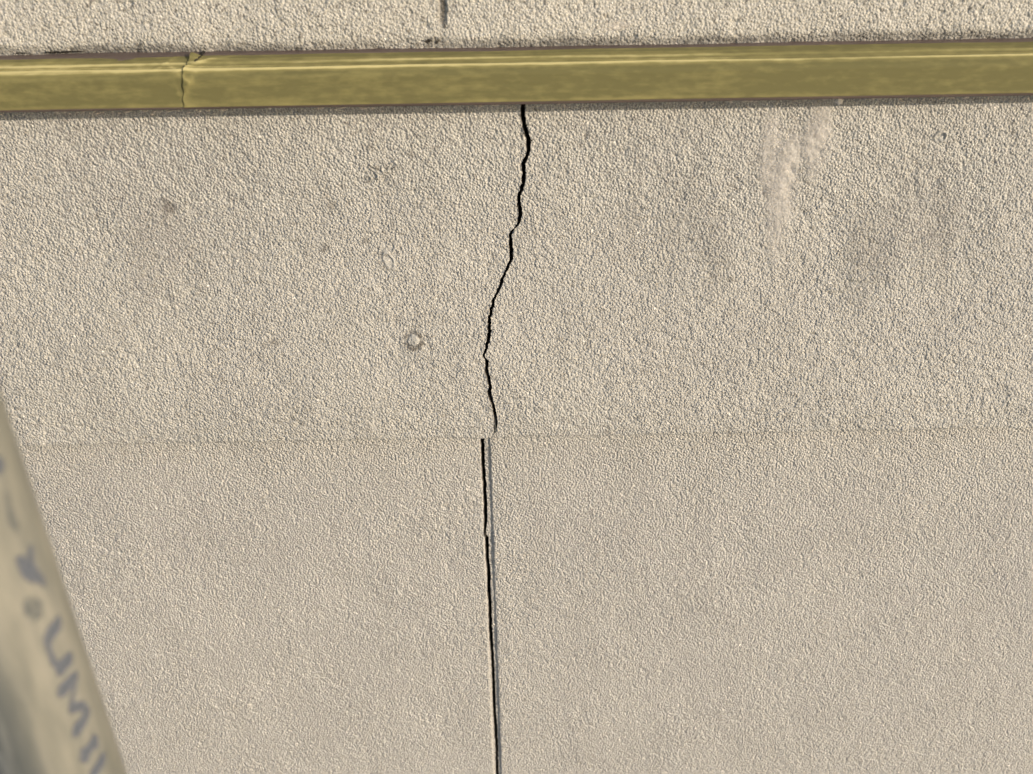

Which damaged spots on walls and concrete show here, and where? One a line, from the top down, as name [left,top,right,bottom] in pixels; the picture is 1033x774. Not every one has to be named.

crack [480,104,534,774]